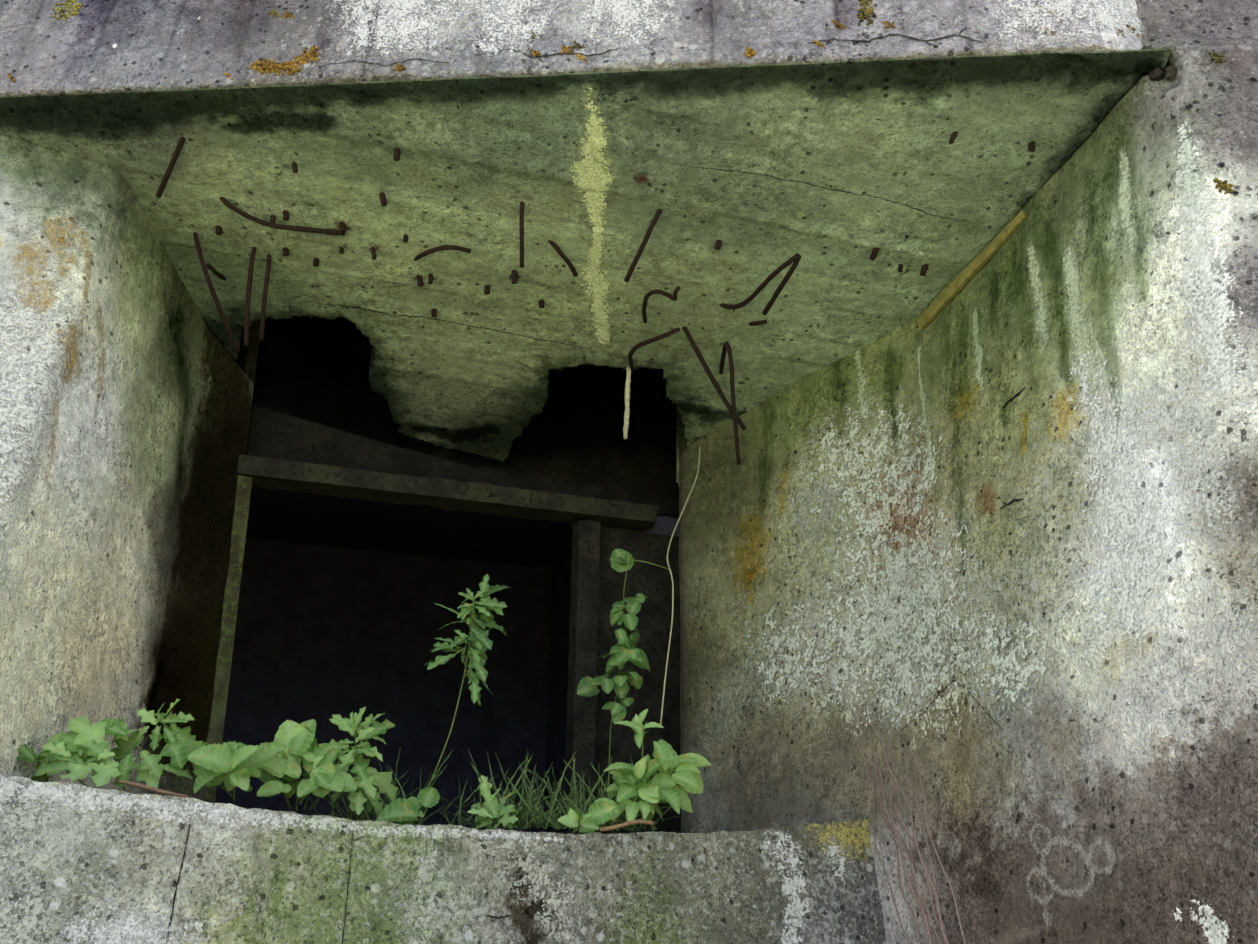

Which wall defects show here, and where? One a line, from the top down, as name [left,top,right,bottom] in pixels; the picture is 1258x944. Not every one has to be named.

damp [0,0,1166,346]
spalling [624,209,663,282]
spalling [642,286,681,324]
spalling [628,326,746,465]
damp [917,346,936,477]
damp [972,306,984,392]
crack [166,814,191,944]
damp [985,873,1053,944]